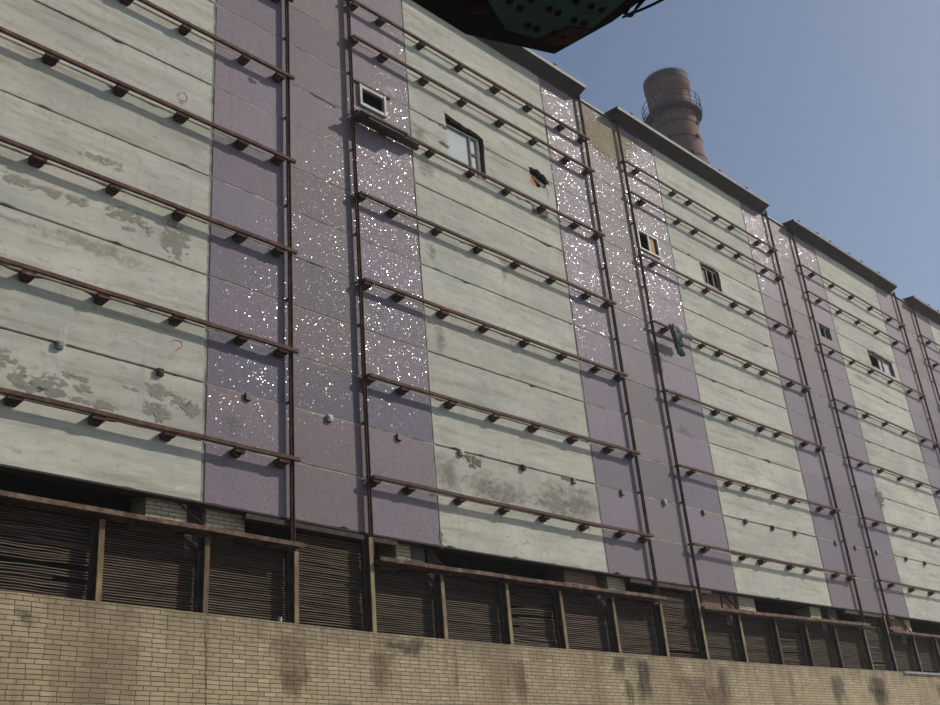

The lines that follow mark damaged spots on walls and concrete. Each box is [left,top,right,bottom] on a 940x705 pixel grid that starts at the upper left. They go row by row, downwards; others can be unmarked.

peeling [2,170,89,206]
peeling [106,205,191,263]
peeling [0,349,126,411]
peeling [124,382,202,422]